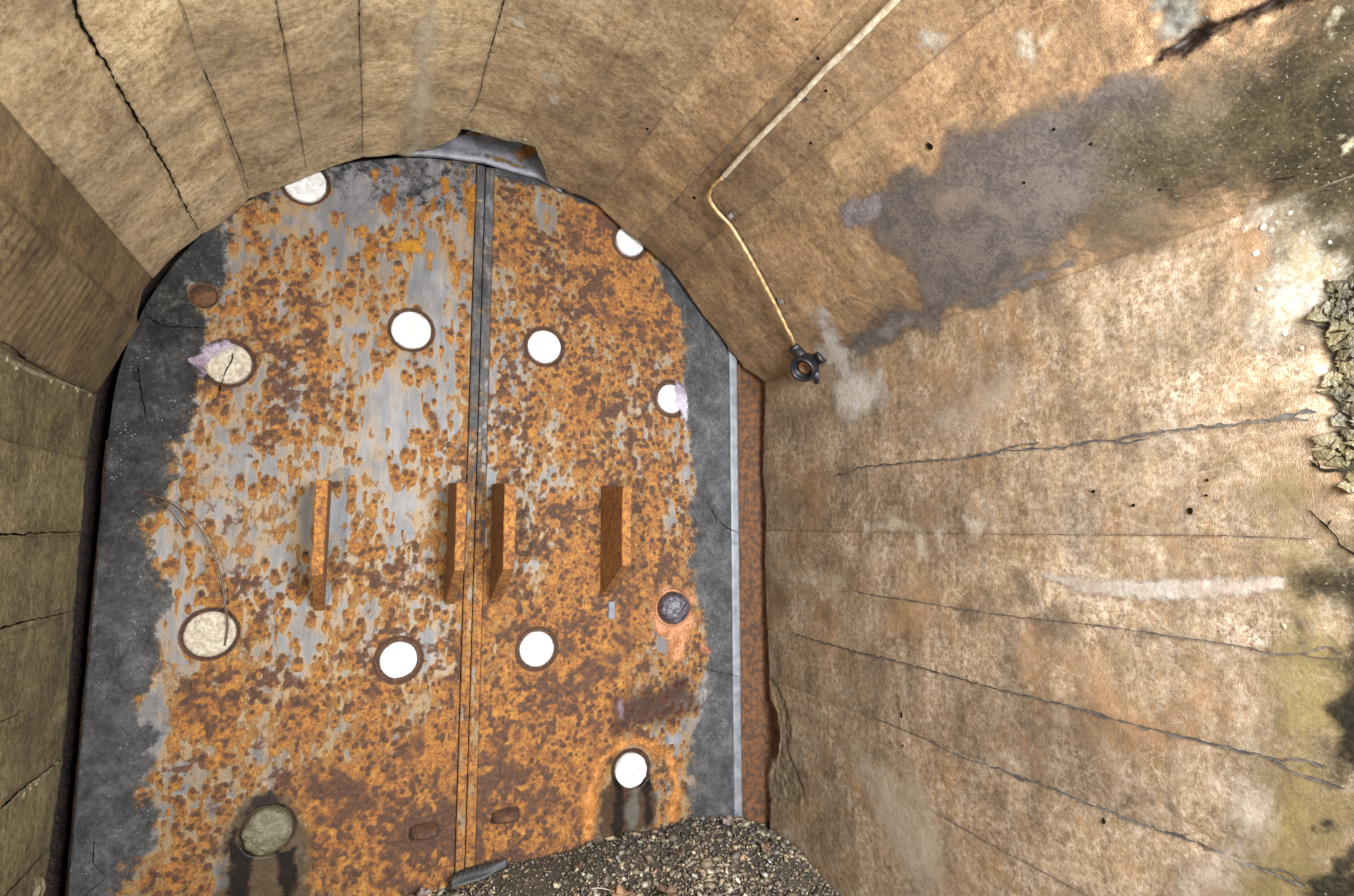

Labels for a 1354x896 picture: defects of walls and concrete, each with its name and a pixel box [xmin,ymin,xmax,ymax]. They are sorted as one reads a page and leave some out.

crack [72,0,199,230]
crack [204,71,250,190]
rust [357,166,450,270]
rust [452,261,460,289]
rust [466,185,477,236]
water stain [816,0,1354,418]
crack [834,408,1317,476]
peeling [1306,273,1354,494]
crack [1309,457,1352,473]
rust [580,587,711,840]
crack [791,632,1346,790]
water stain [1224,564,1354,896]